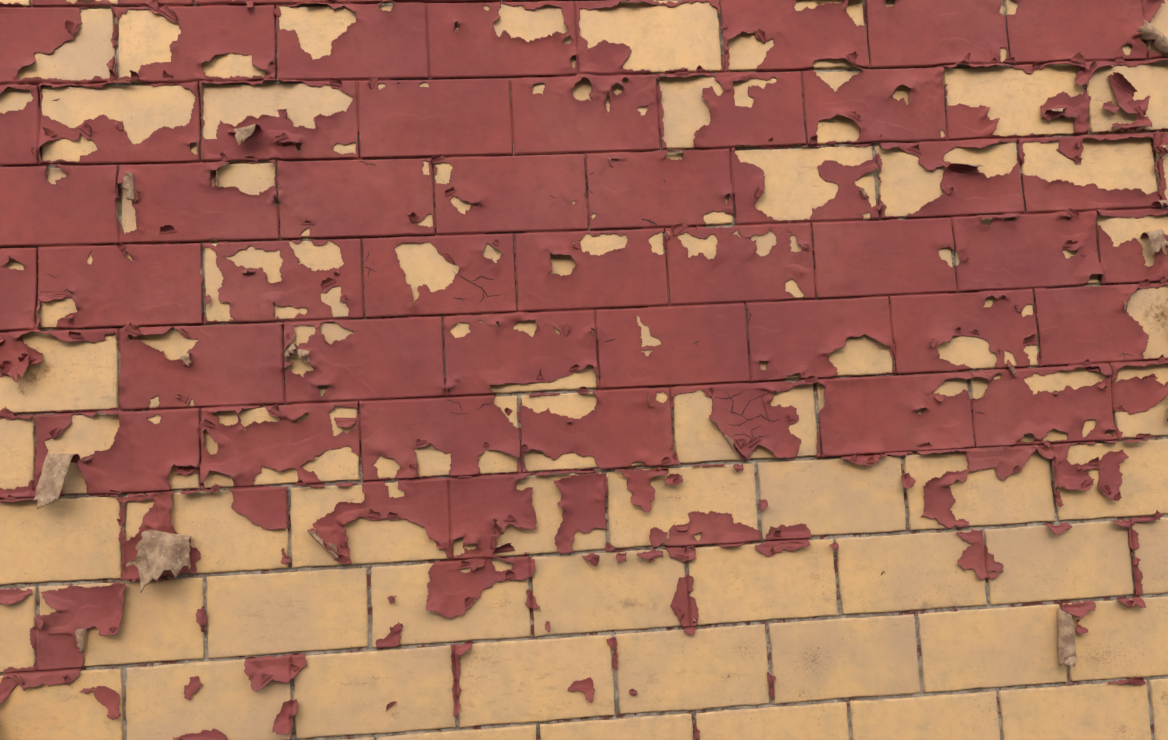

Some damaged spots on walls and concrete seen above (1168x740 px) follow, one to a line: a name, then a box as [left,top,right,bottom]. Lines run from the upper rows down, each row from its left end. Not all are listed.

peeling [0,0,356,195]
peeling [484,1,777,160]
peeling [115,171,140,259]
peeling [203,220,354,376]
peeling [395,242,460,303]
peeling [423,154,480,214]
peeling [550,234,628,276]
peeling [649,0,1168,580]
peeling [0,290,198,510]
peeling [490,364,596,427]
crack [714,390,781,438]
peeling [0,387,812,720]